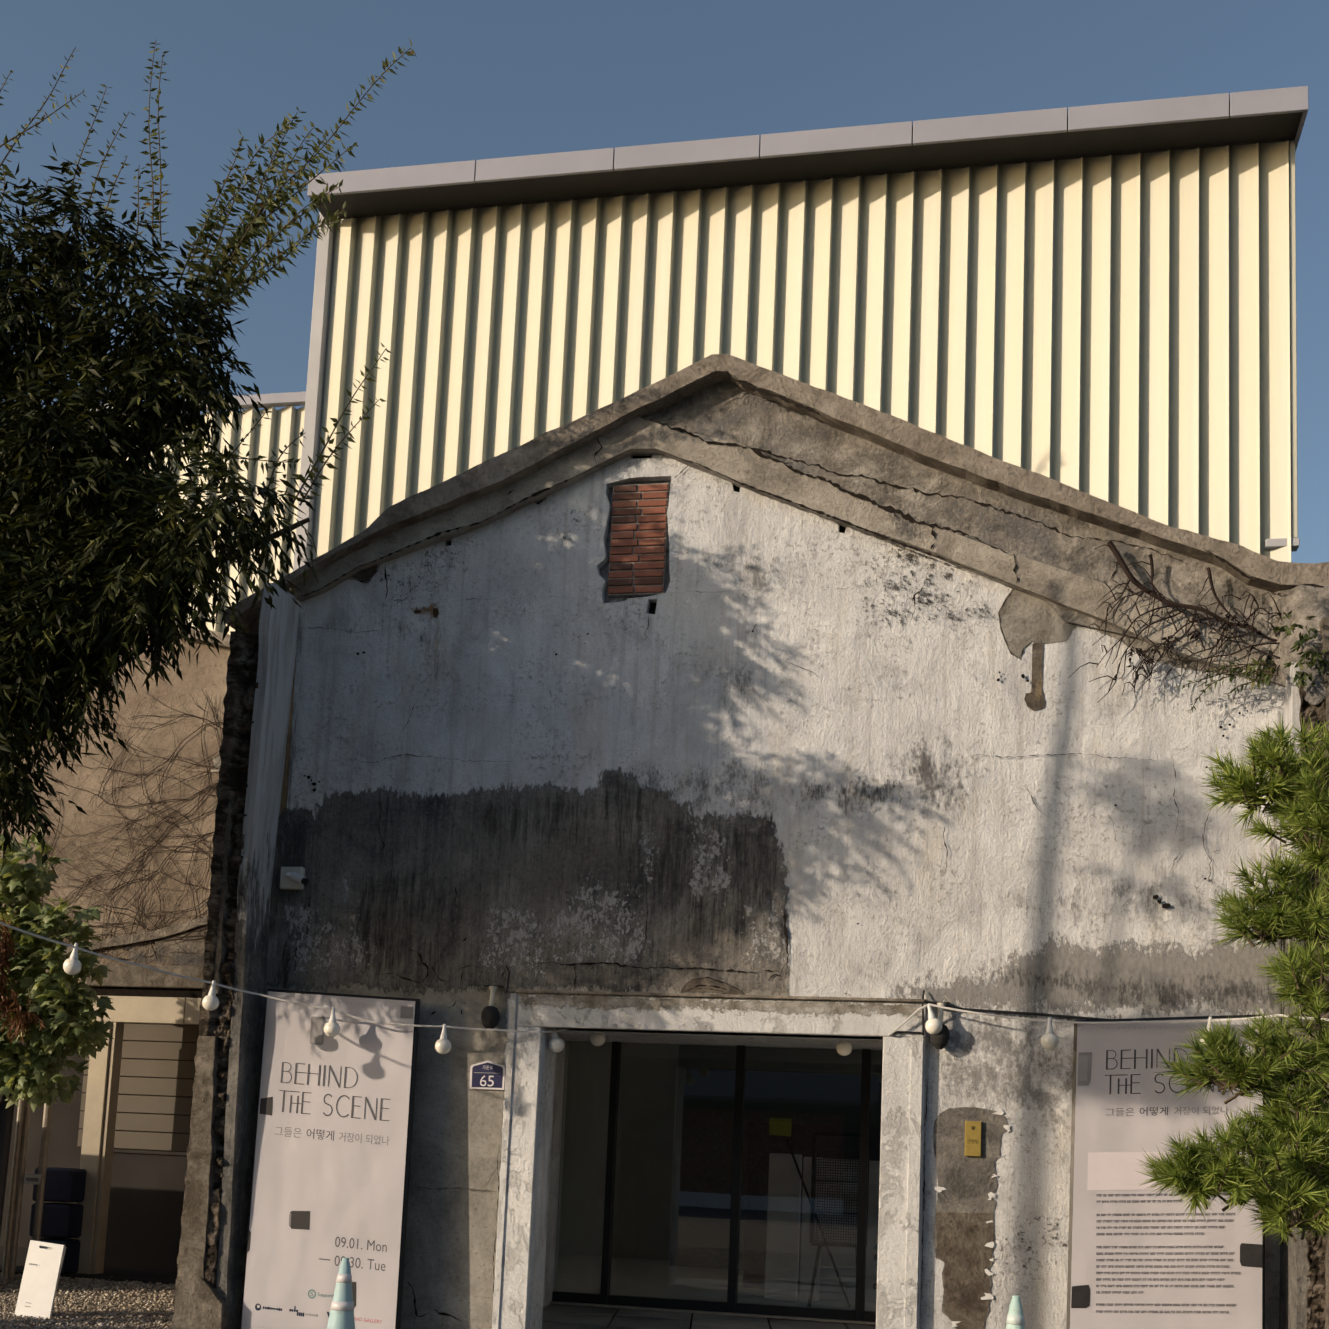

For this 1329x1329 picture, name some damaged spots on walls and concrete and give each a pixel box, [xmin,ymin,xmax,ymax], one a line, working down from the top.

crack [685,371,821,415]
corrosion [412,604,439,618]
crack [298,438,623,633]
water stain [851,513,1001,646]
crack [643,418,1324,620]
flaking render [998,589,1078,711]
peeling [1096,629,1238,676]
water stain [889,932,1284,1025]
peeling [931,1015,1073,1329]